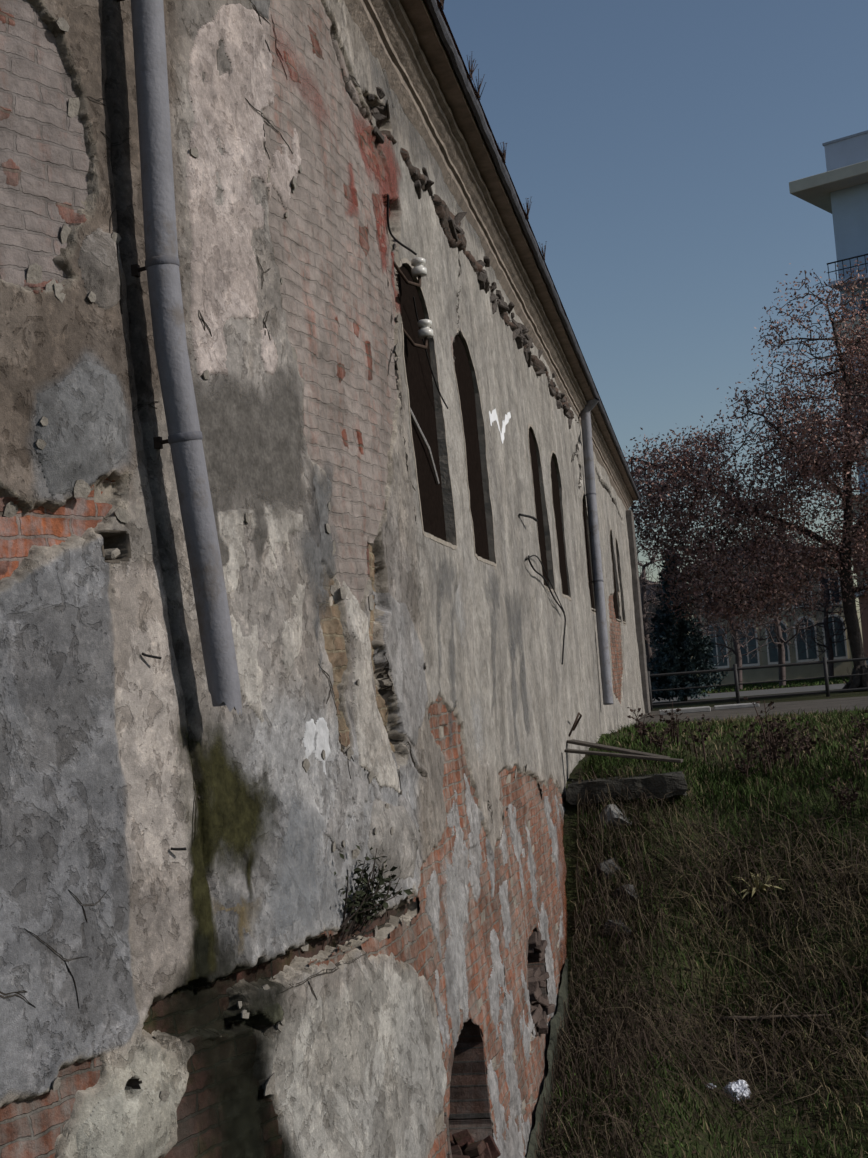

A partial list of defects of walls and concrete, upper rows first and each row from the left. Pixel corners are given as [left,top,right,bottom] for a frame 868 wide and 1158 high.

spalling [0,0,90,303]
spalling [0,478,131,580]
spalling [186,0,567,1158]
crack [0,990,35,1007]
crack [24,928,88,1007]
crack [68,889,109,923]
leakage [165,729,292,1158]
spalling [0,1056,102,1158]
spalling [125,1077,142,1094]
spalling [142,997,220,1158]